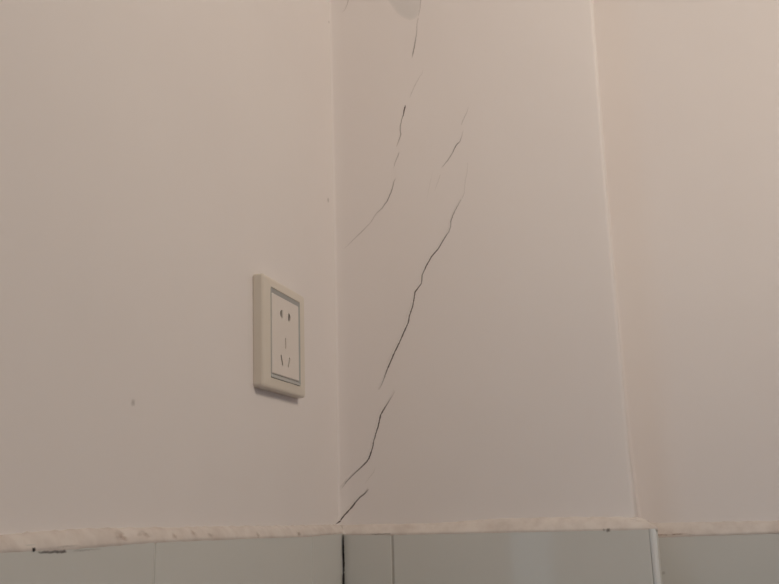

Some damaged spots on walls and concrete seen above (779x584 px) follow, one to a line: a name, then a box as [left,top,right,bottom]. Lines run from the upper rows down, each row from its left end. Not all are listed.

crack [336,198,461,524]